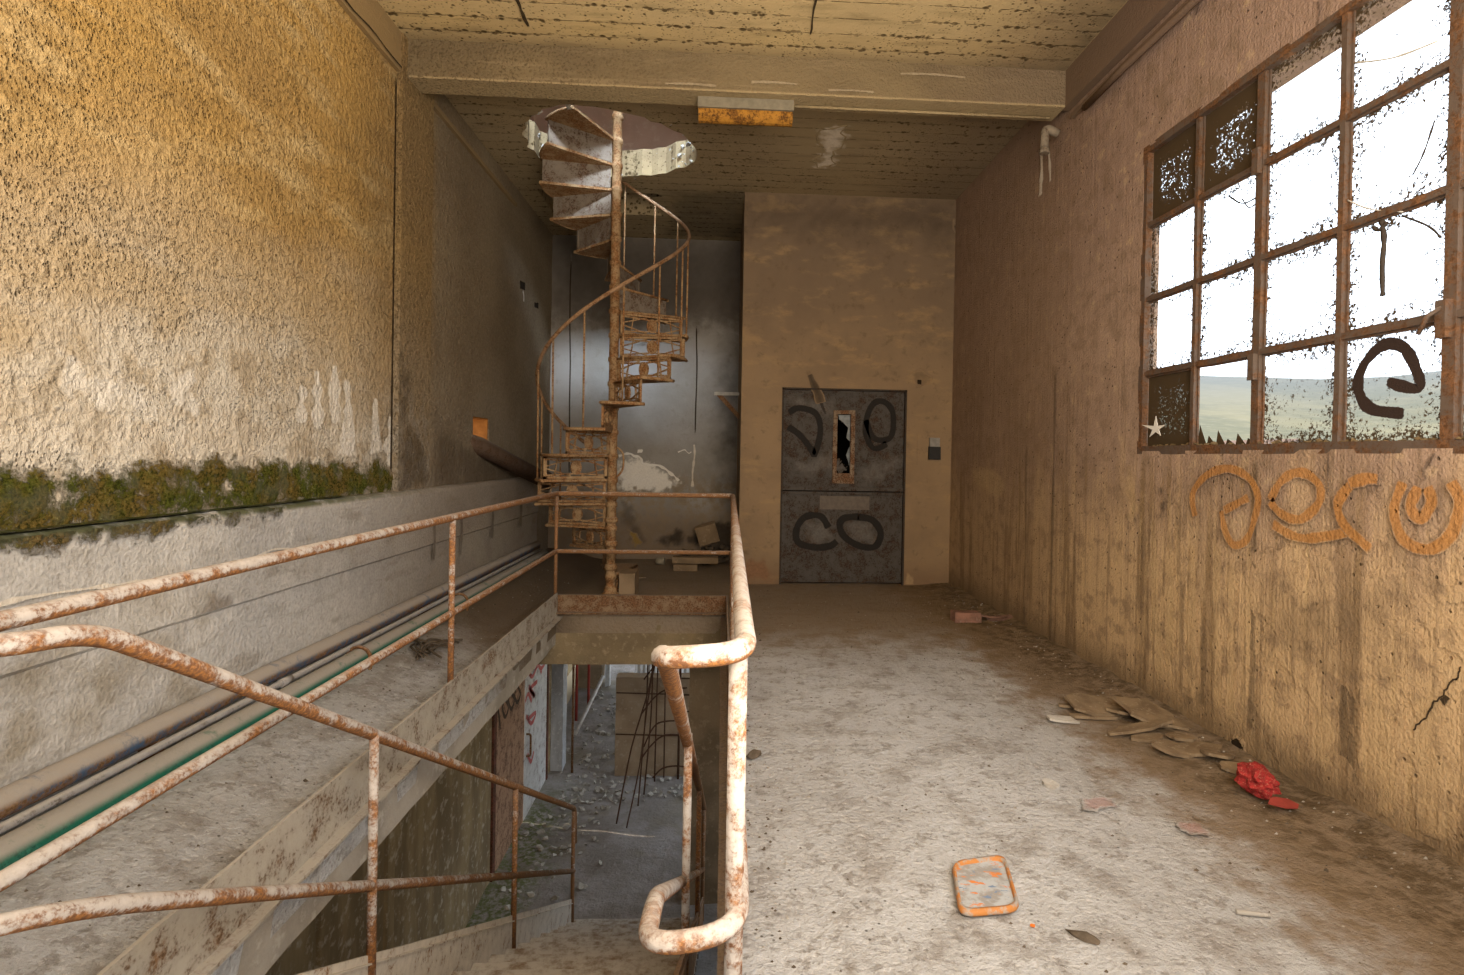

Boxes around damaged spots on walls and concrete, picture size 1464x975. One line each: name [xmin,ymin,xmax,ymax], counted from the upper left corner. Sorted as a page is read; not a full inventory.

crack [515,0,530,27]
crack [809,0,817,36]
leakage [0,30,543,504]
leakage [1049,368,1057,641]
leakage [0,579,146,607]
leakage [1149,460,1464,868]
crack [1413,666,1462,731]